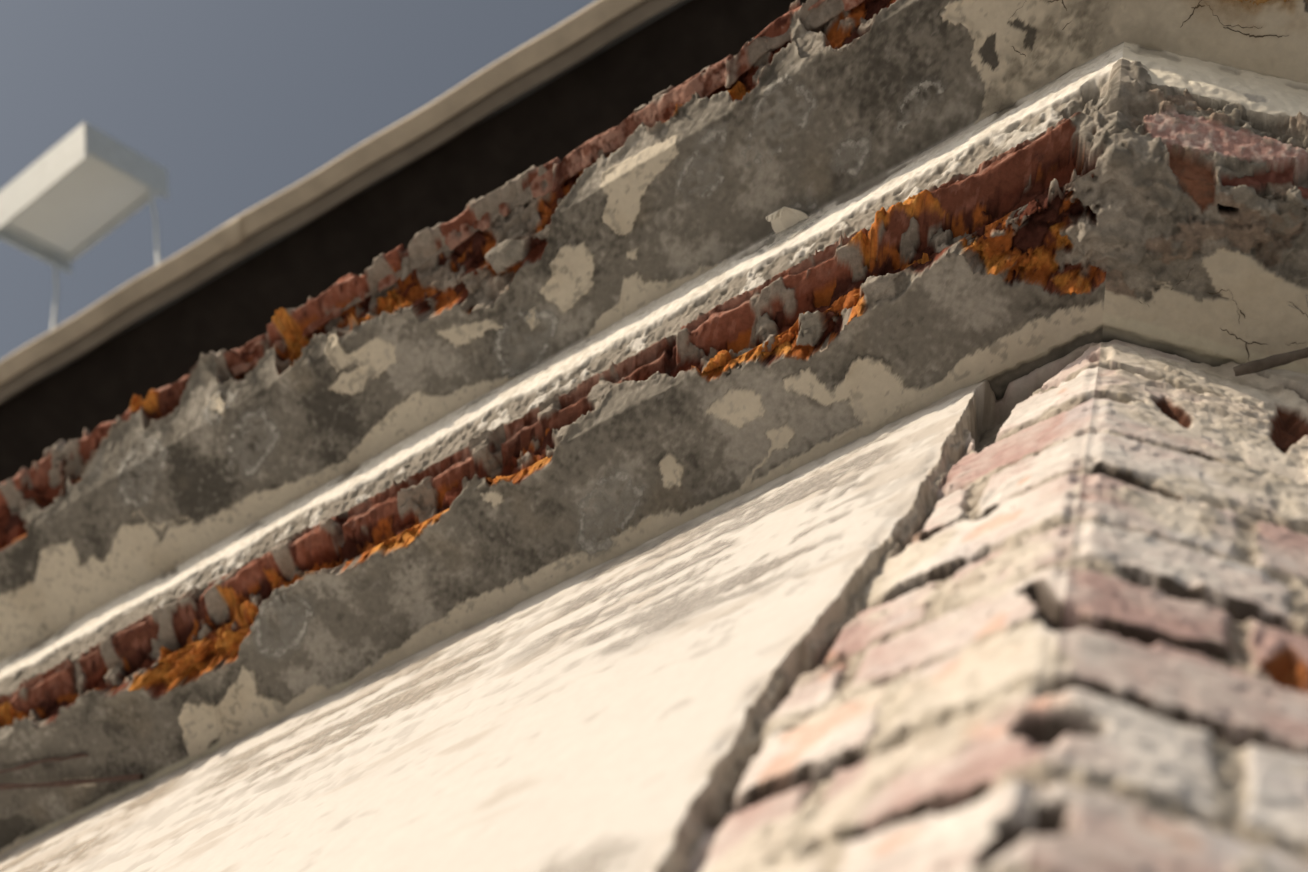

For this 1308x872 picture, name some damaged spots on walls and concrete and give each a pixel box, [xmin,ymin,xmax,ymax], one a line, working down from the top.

spalling [201,0,896,416]
crack [1180,0,1289,38]
spalling [0,75,1308,758]
peeling [0,813,33,855]
spalling [653,385,1038,872]
spalling [1033,810,1063,836]